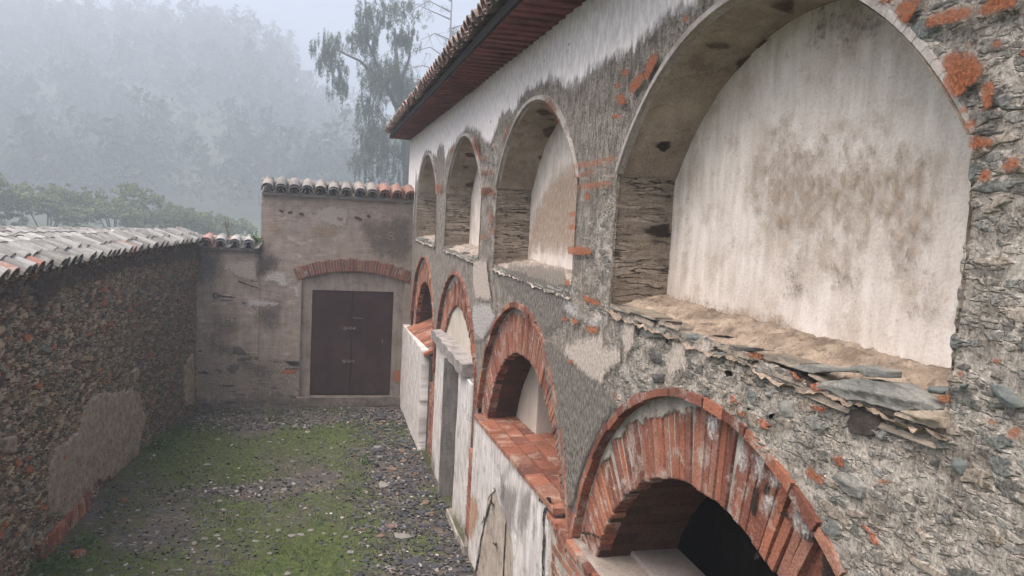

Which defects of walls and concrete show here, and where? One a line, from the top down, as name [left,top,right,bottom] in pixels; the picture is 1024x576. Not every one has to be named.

flaking render [612,52,657,119]
water stain [752,127,929,272]
spalling [729,347,771,362]
spalling [794,364,969,435]
peeling [45,368,146,518]
spalling [805,456,889,499]
crack [475,475,501,572]